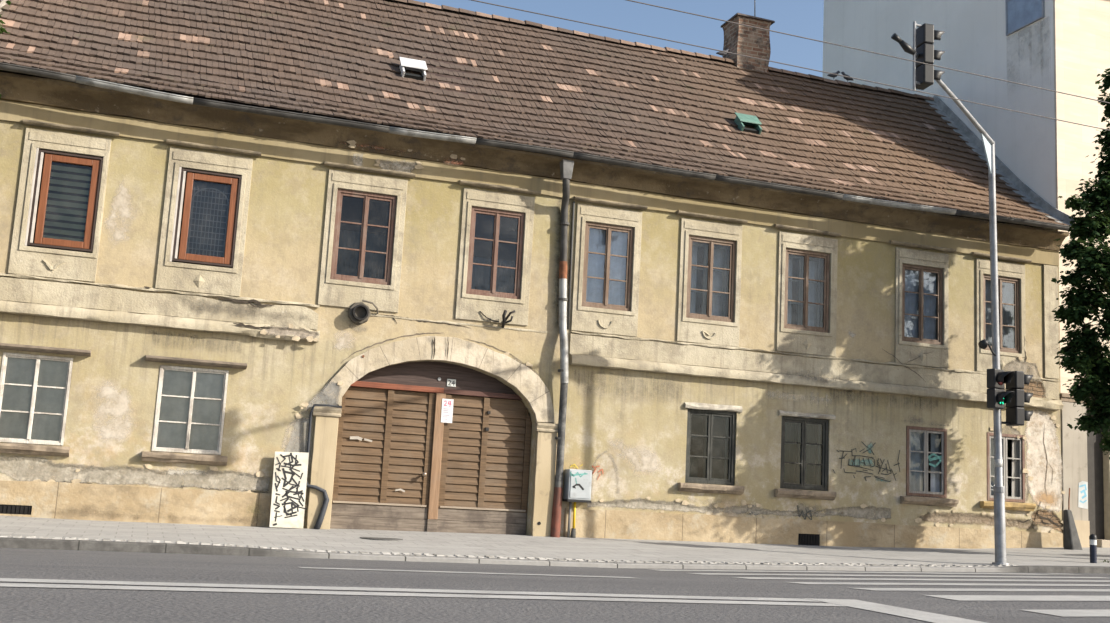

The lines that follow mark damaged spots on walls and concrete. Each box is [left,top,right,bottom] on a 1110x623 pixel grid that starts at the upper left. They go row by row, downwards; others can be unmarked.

spalling [0,456,270,493]
peeling [915,357,1065,533]